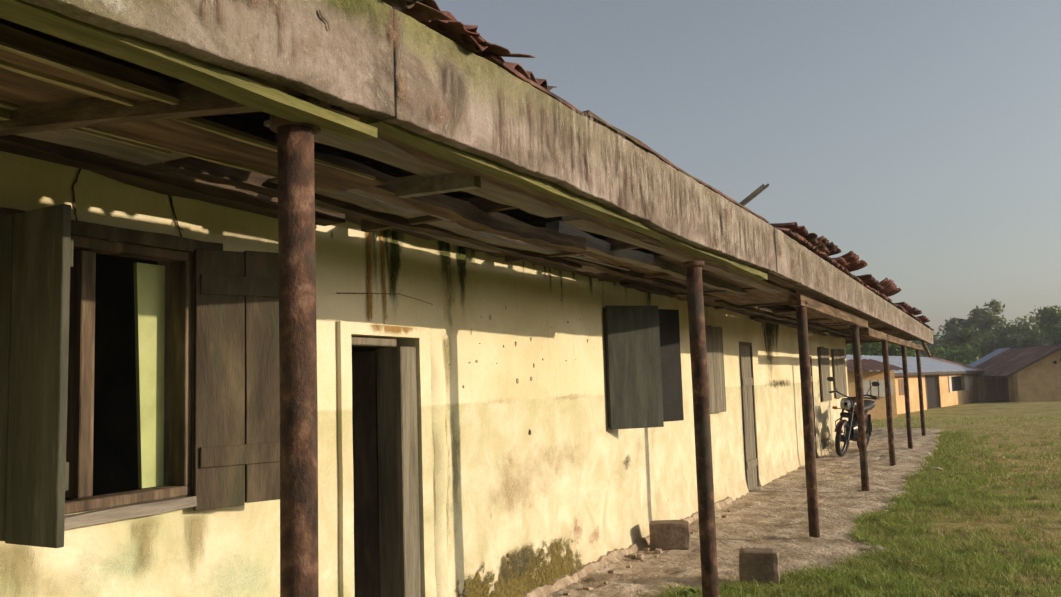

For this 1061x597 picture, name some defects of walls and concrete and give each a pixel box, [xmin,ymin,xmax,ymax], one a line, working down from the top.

crack [72,168,81,221]
crack [168,195,184,237]
rust [366,230,412,333]
water stain [383,229,399,295]
water stain [438,241,475,309]